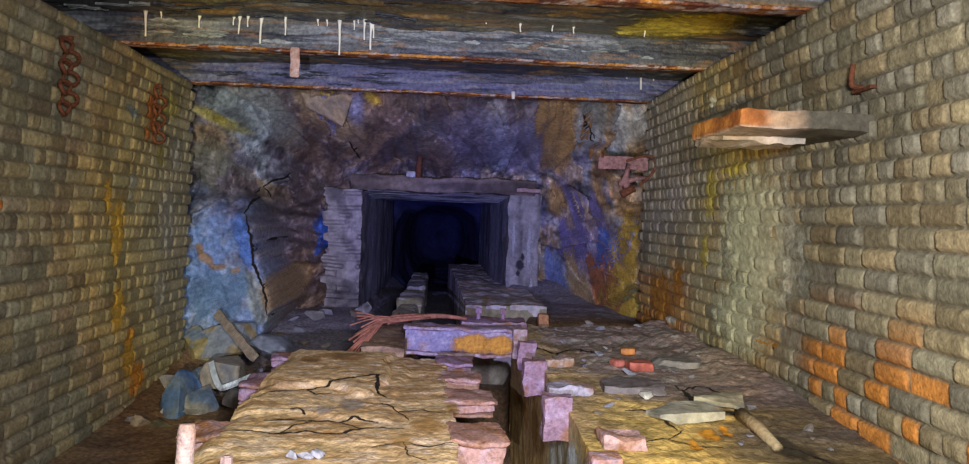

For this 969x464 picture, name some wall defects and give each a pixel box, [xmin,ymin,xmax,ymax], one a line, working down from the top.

crack [244,173,291,315]
crack [221,374,452,460]